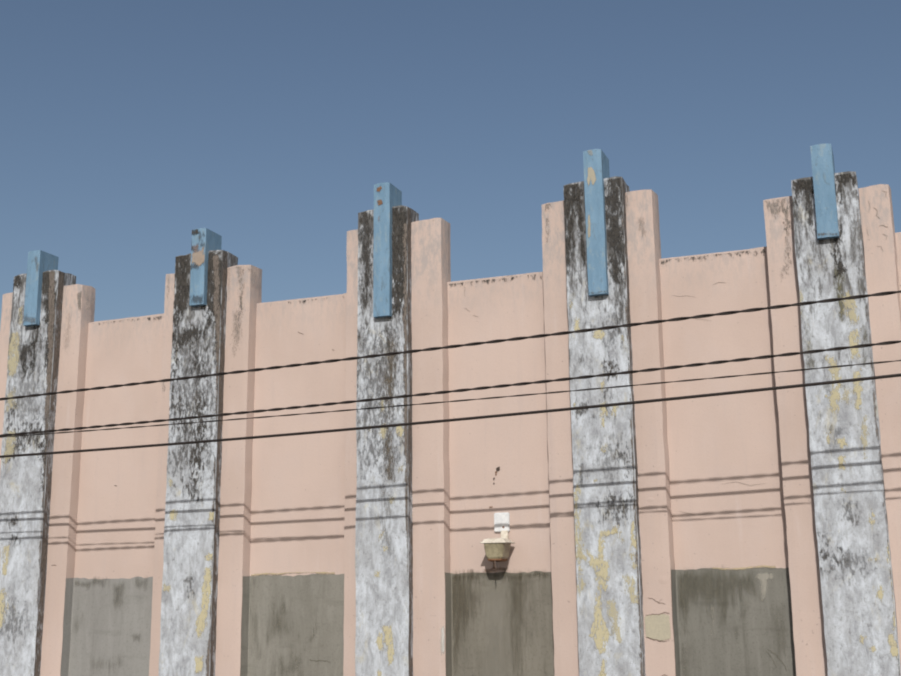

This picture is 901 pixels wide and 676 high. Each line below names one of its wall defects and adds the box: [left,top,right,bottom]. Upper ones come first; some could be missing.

water stain [358,212,374,309]
water stain [388,207,407,320]
water stain [564,184,586,274]
water stain [604,178,627,289]
water stain [767,179,847,320]
water stain [168,242,222,501]
peeling [825,355,879,459]
peeling [842,288,871,359]
peeling [574,358,643,676]
peeling [195,547,213,676]
peeling [376,626,394,676]
peeling [868,495,900,676]